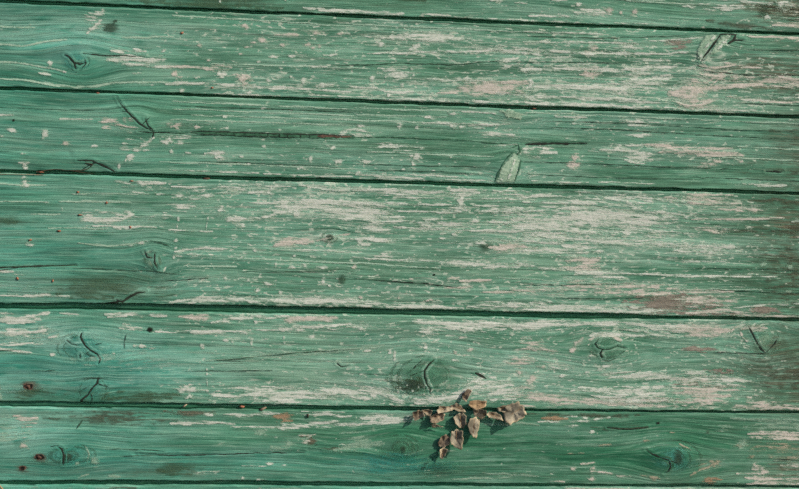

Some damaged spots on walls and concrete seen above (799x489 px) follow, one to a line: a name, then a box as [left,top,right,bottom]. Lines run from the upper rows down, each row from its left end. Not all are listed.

peeling [85,9,105,34]
peeling [303,7,405,15]
crack [118,100,799,183]
peeling [38,142,799,451]
crack [67,333,108,428]
crack [411,360,434,394]
peeling [0,415,39,447]
peeling [554,453,624,489]
peeling [690,460,722,484]